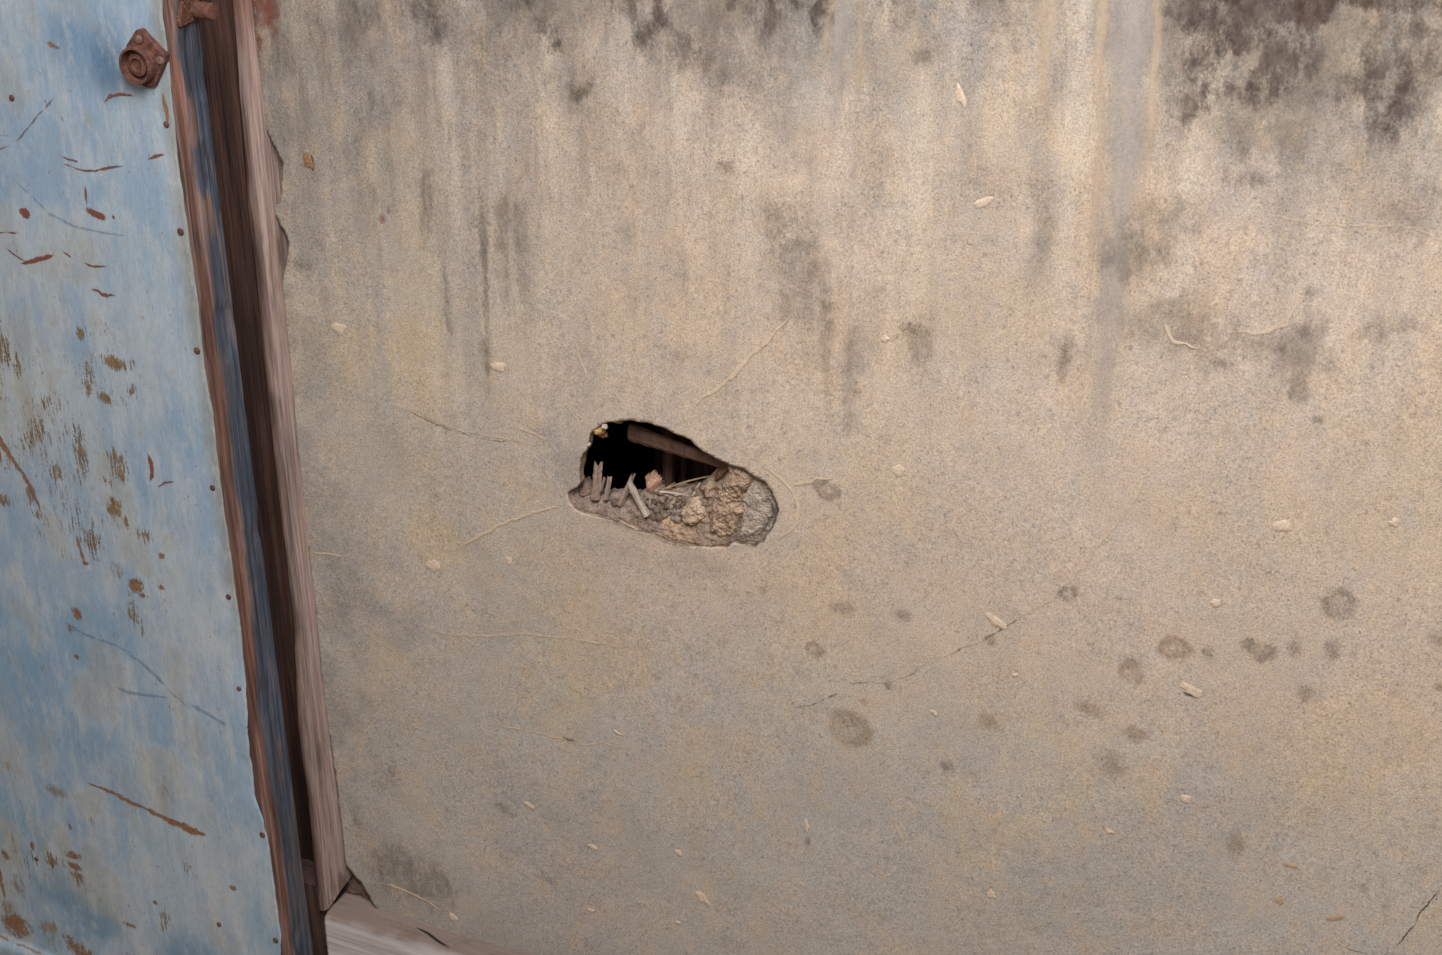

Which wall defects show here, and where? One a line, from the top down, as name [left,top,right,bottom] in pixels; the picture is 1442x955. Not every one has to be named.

damp [1091,0,1379,241]
damp [1369,67,1414,131]
rust [0,329,22,378]
rust [76,354,137,404]
rust [0,393,149,565]
hole [569,420,779,547]
rust [118,571,164,635]
rust [88,783,205,836]
rust [0,835,92,955]
crack [1333,885,1442,955]